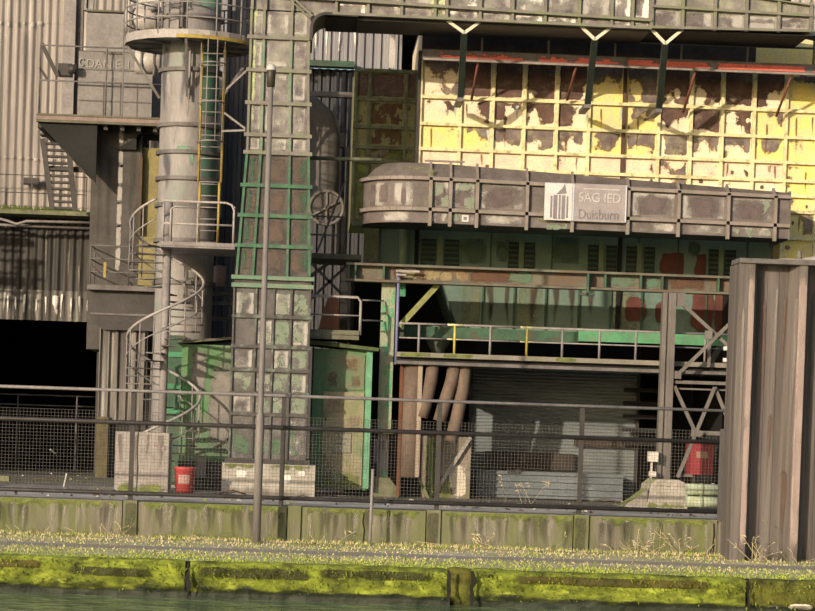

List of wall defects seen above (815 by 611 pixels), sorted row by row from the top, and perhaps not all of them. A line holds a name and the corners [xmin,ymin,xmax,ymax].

peeling [425,52,815,184]
peeling [433,183,459,221]
peeling [458,182,475,209]
corrosion [393,268,510,320]
corrosion [669,278,704,290]
damp [0,559,40,567]